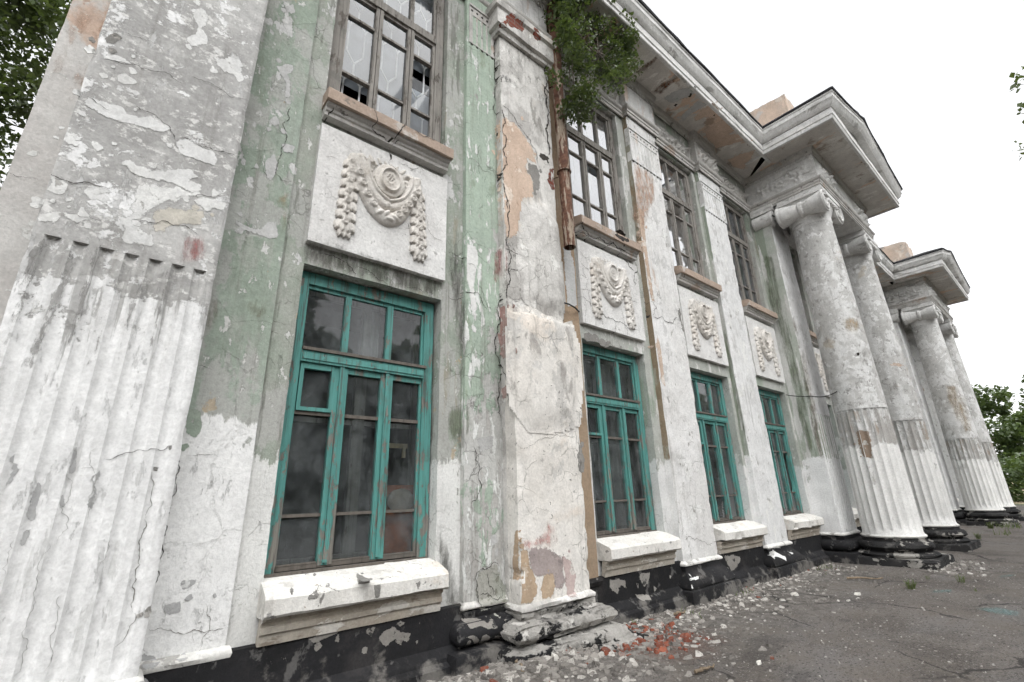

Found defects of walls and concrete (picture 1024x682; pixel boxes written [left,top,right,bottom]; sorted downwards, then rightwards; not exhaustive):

peeling [84,33,137,84]
peeling [186,0,244,82]
flaking render [499,13,541,41]
peeling [72,89,226,246]
crack [408,43,550,417]
peeling [490,116,555,359]
peeling [168,409,202,451]
peeling [854,430,874,458]
crack [21,446,224,672]
crack [475,562,501,611]
peeling [461,530,577,647]
spalling [362,621,418,654]